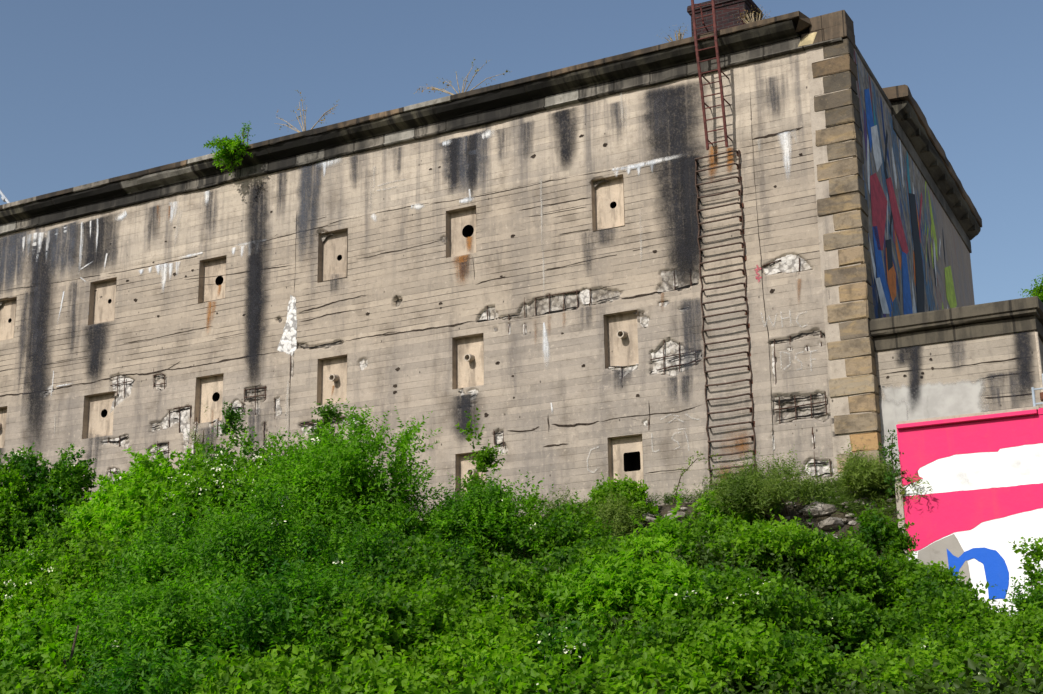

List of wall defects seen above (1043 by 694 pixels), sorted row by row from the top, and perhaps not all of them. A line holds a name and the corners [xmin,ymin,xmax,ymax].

damp [440,131,504,203]
damp [553,108,575,165]
damp [612,84,700,267]
damp [232,173,285,371]
corrosion [459,237,471,278]
spalling [762,254,813,275]
damp [0,211,126,441]
spalling [477,288,622,335]
spalling [650,340,702,376]
spalling [150,405,222,461]
spalling [231,386,282,455]
spalling [770,330,835,479]